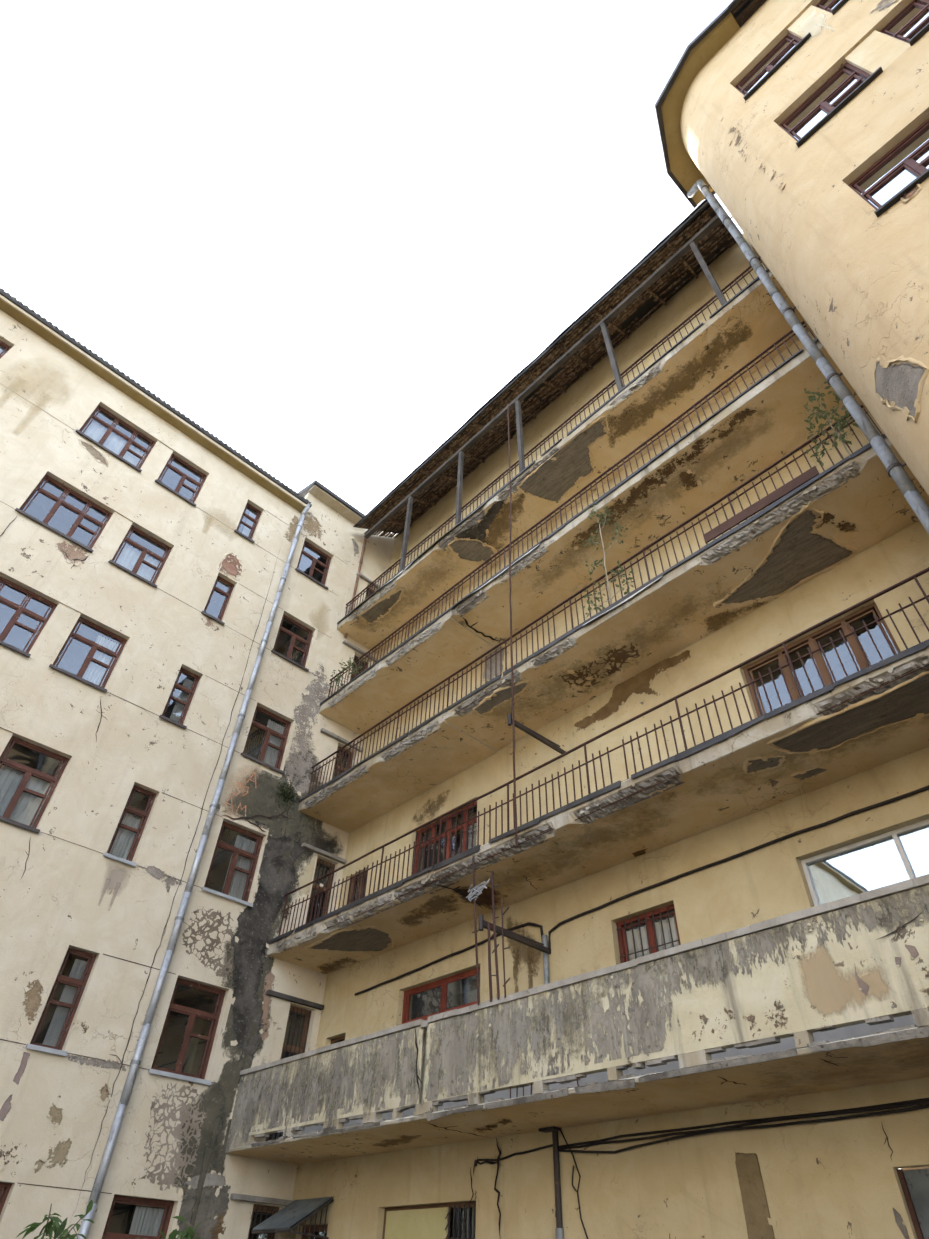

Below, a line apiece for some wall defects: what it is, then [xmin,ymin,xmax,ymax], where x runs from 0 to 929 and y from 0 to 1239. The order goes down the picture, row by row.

spalling [438,362,664,563]
leakage [604,321,751,448]
spalling [700,461,862,609]
spalling [874,355,929,423]
peeling [283,621,444,809]
peeling [562,643,690,729]
spalling [743,655,929,787]
peeling [22,980,45,1025]
leakage [174,743,386,1229]
spalling [181,825,553,1056]
peeling [225,887,929,1153]
peeling [139,1080,231,1239]